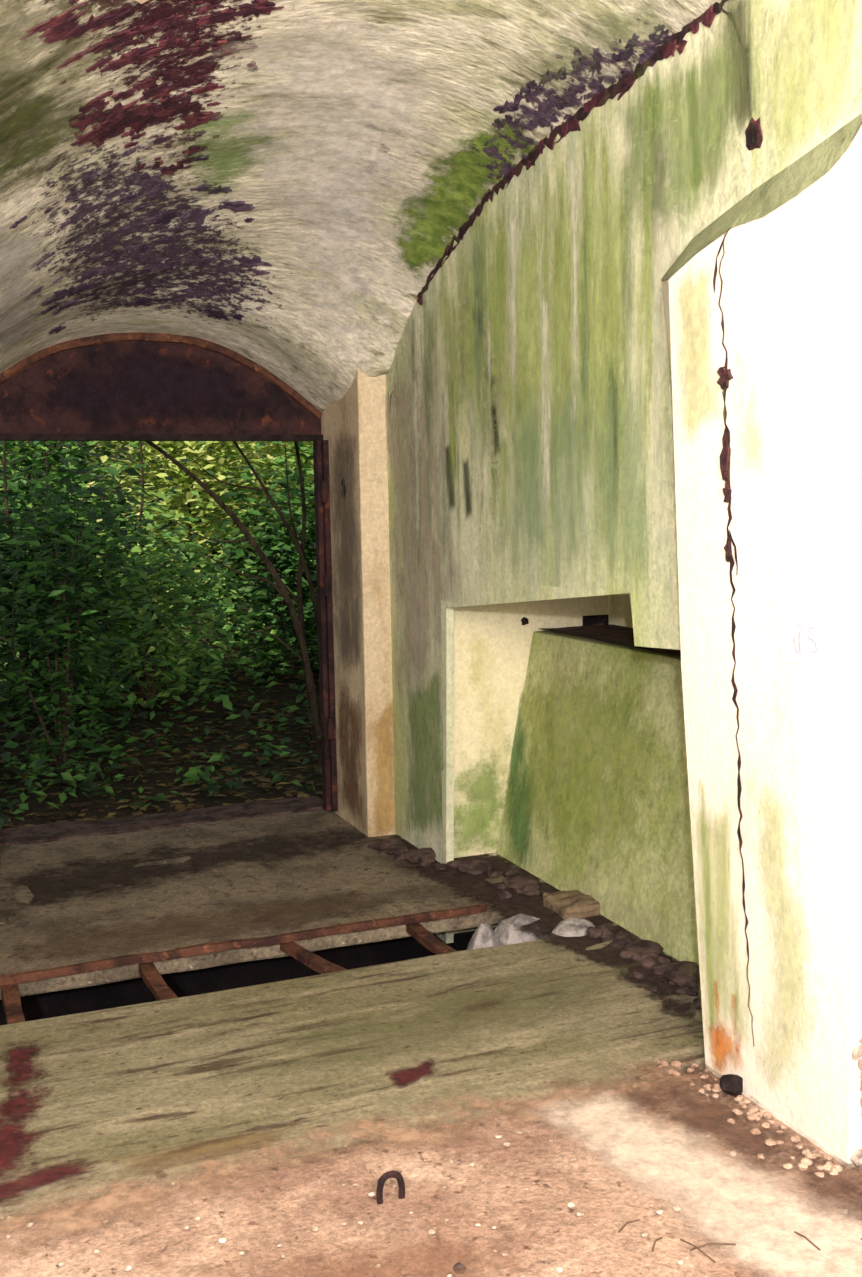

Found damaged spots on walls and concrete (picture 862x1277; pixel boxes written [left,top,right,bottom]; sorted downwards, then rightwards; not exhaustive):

peeling [4,0,294,337]
leakage [387,214,516,685]
leakage [541,148,588,497]
peeling [471,18,674,180]
crack [417,0,738,305]
leakage [608,88,681,499]
leakage [727,0,751,122]
leakage [392,835,712,1023]
spalling [850,1149,862,1169]
spalling [852,1039,862,1116]